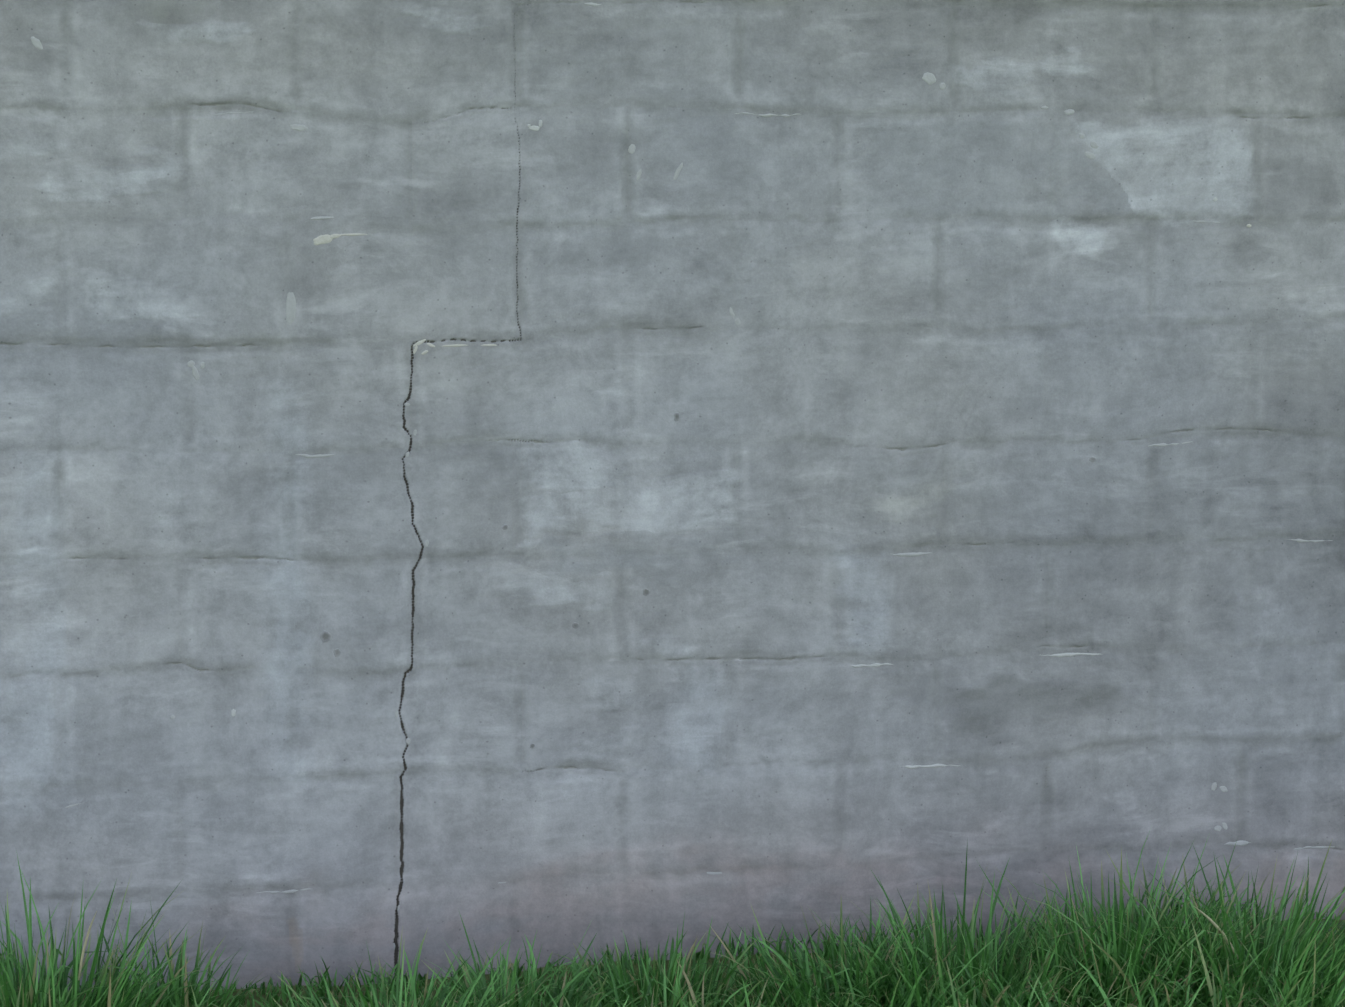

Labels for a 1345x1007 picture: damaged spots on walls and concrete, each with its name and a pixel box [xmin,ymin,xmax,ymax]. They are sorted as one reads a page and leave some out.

crack [393,59,521,982]